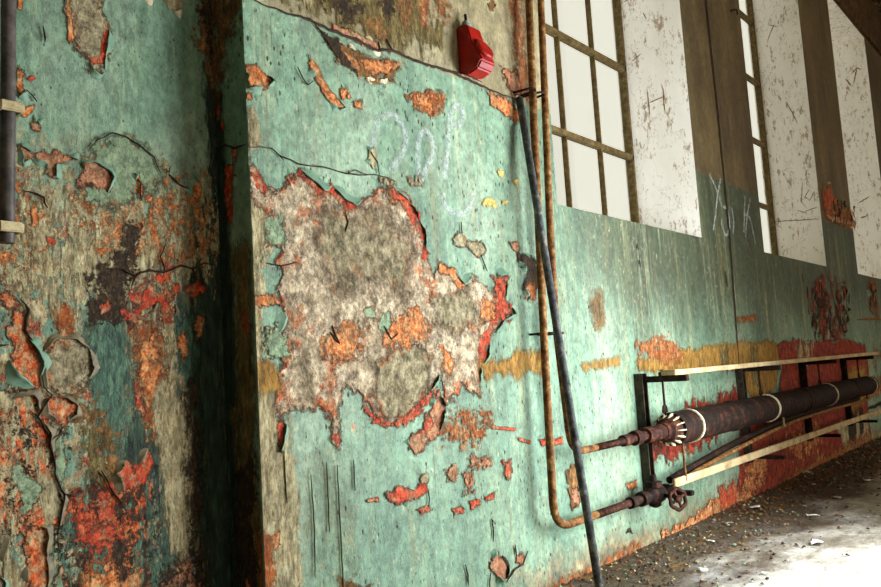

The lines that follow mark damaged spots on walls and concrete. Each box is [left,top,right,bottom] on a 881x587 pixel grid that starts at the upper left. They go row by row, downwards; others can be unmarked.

peeling [63,0,115,80]
peeling [323,22,408,92]
crack [255,0,516,99]
crack [88,132,190,189]
crack [215,144,394,181]
peeling [246,64,517,456]
peeling [0,143,238,587]
peeling [771,270,870,394]
crack [29,375,76,547]
peeling [367,473,436,517]
peeling [445,446,514,519]
peeling [736,396,871,498]